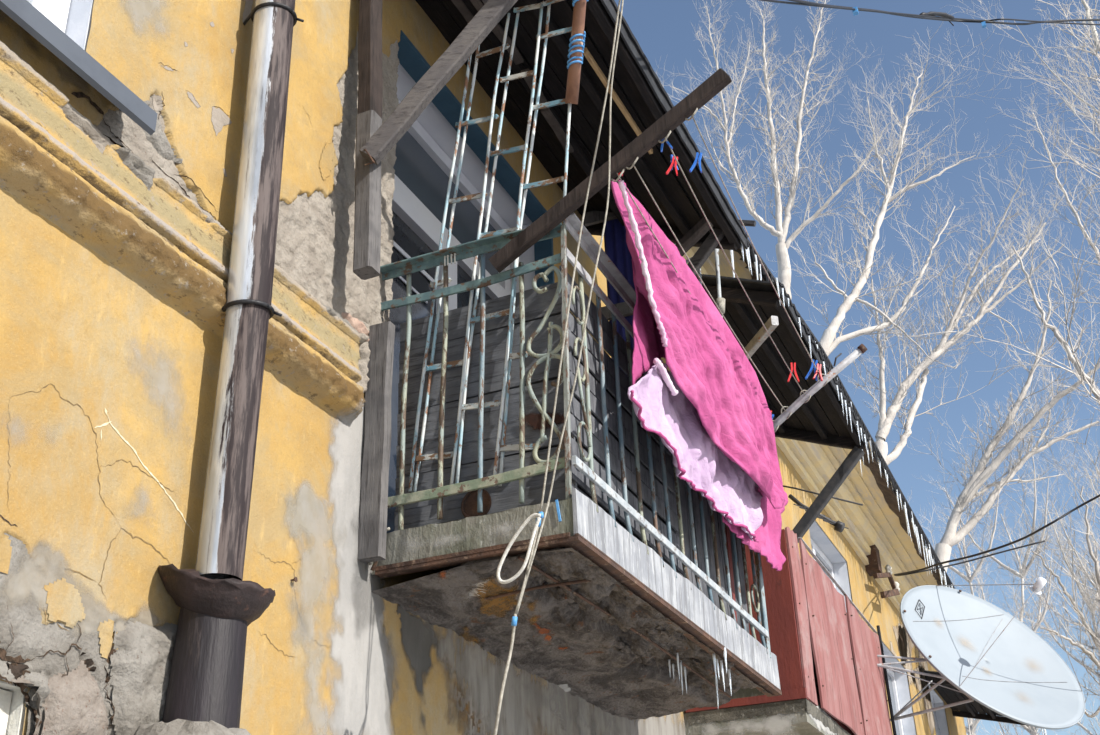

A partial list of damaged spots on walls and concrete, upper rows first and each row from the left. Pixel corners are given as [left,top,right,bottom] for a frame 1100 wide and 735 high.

spalling [62,92,232,235]
spalling [275,31,399,397]
crack [0,383,171,600]
rust [525,412,564,430]
spalling [0,528,135,735]
rust [475,578,568,650]